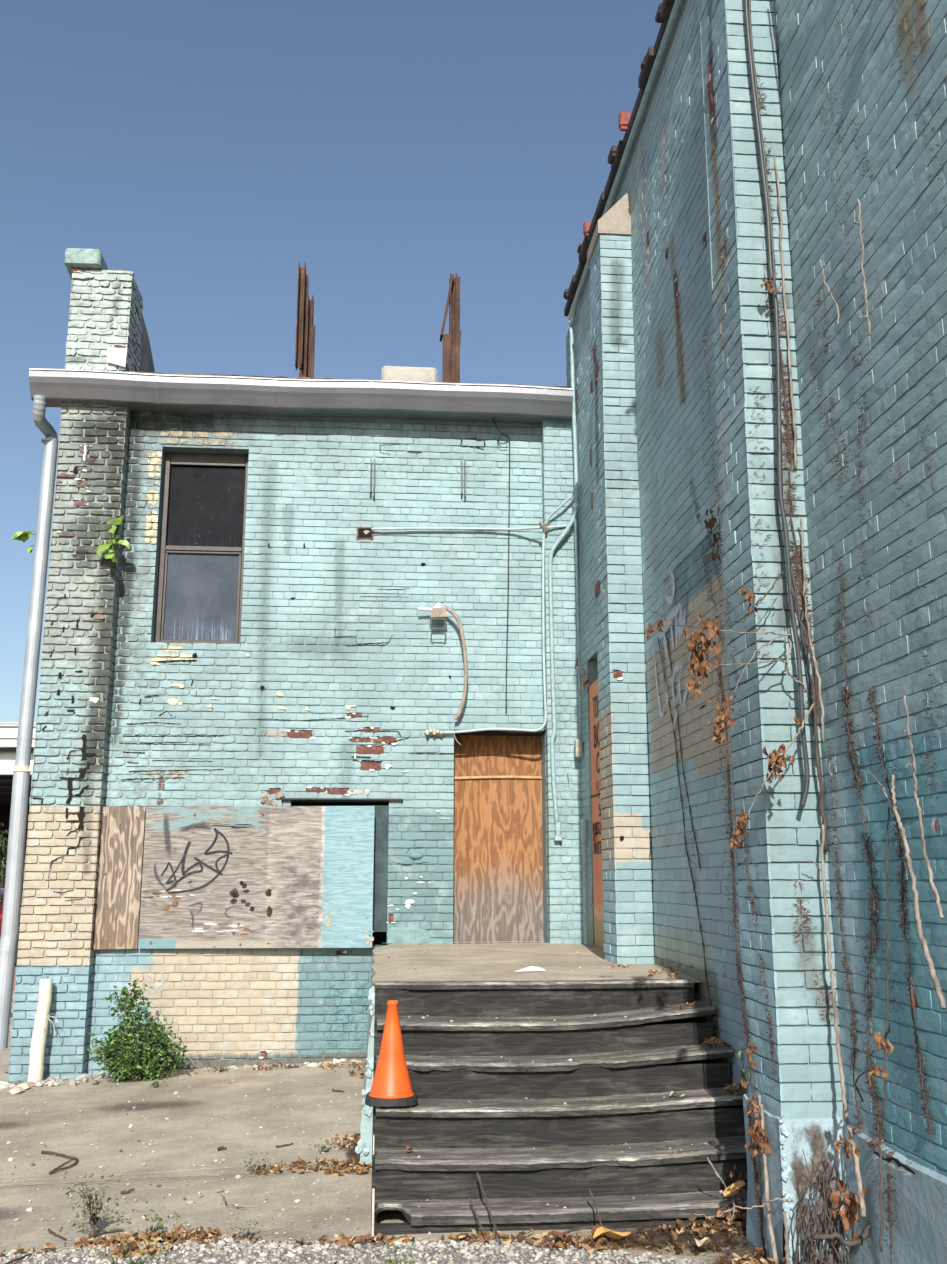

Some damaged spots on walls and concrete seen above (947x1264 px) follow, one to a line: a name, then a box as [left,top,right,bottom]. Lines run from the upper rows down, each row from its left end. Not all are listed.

corrosion [710,114,721,261]
spalling [56,444,96,506]
peeling [151,646,197,665]
spalling [345,705,410,772]
spalling [306,786,370,796]
damp [792,1125,844,1264]